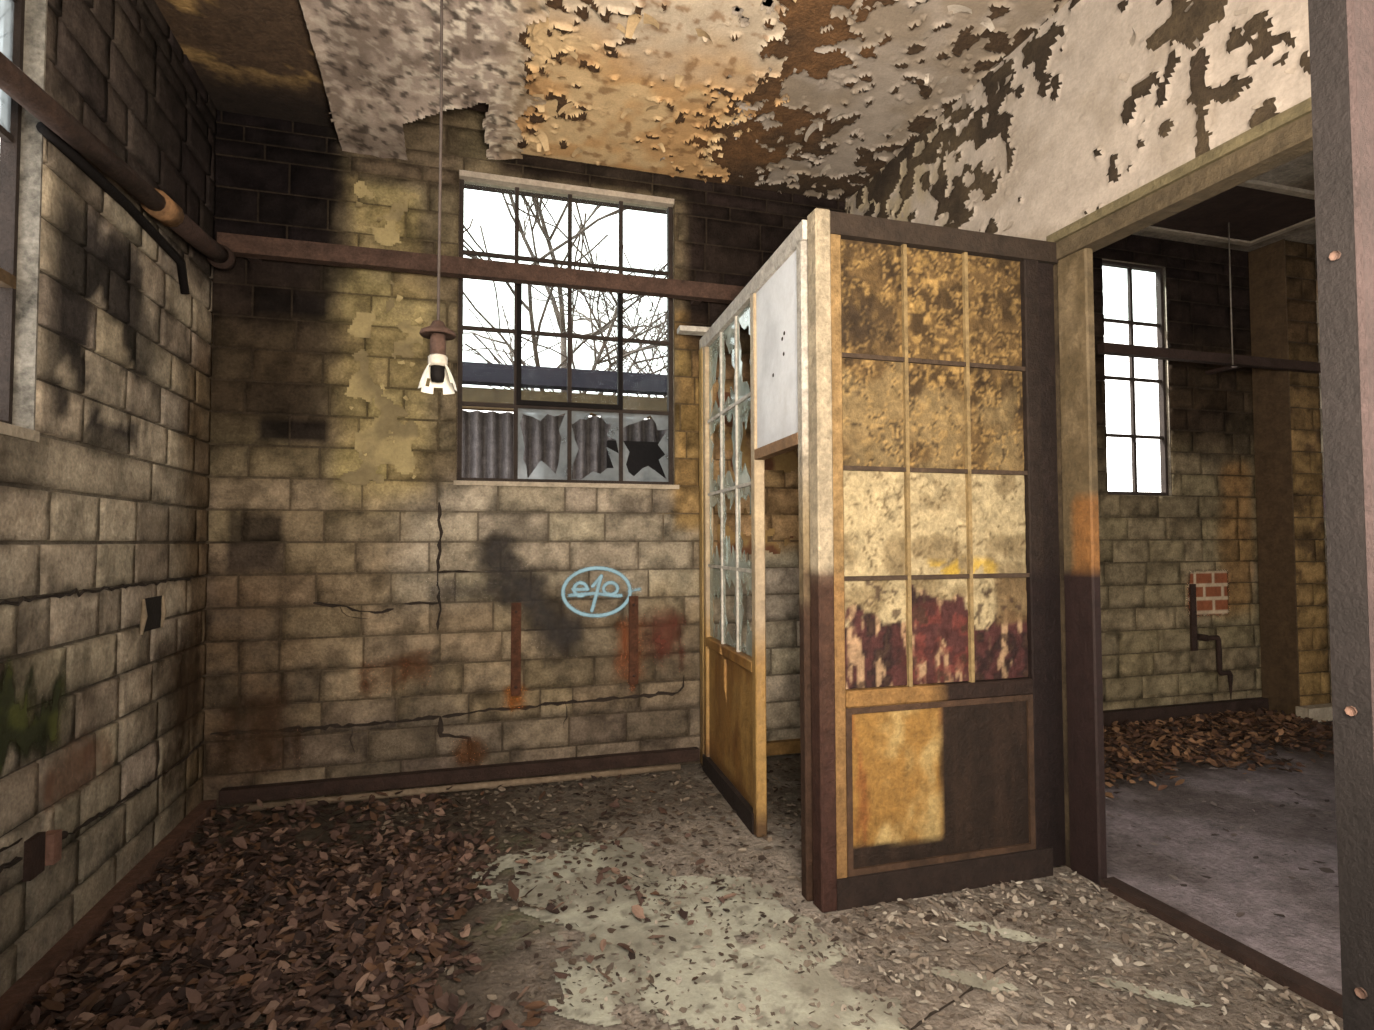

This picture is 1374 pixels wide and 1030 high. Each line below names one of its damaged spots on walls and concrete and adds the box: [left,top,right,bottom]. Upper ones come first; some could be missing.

peeling [515,0,1311,241]